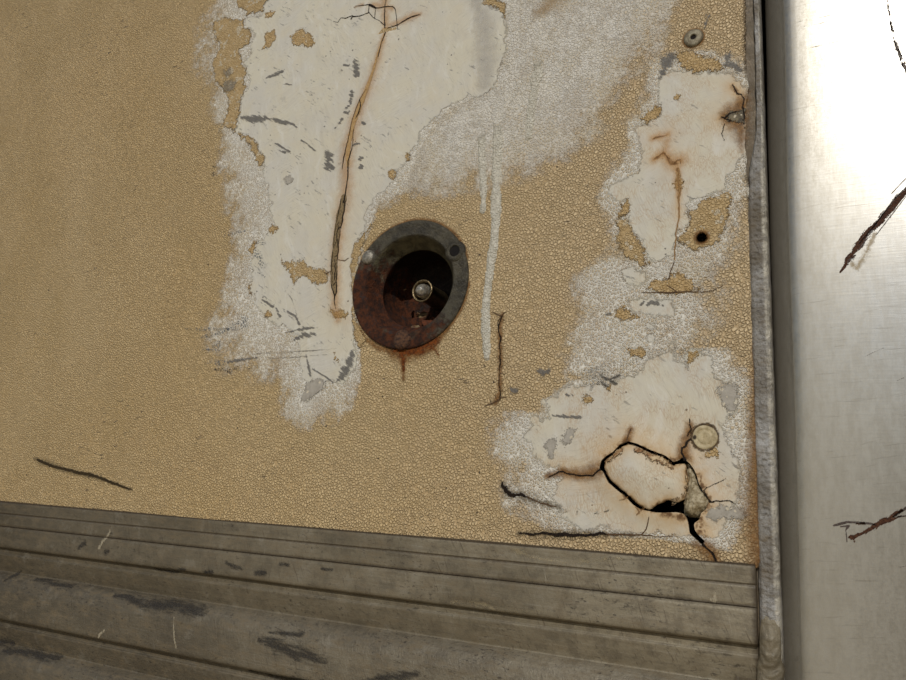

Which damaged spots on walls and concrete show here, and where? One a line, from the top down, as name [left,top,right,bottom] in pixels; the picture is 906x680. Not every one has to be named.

crack [323,0,420,308]
crack [644,136,723,293]
peeling [194,0,753,551]
rust [360,282,470,381]
crack [484,311,505,407]
crack [624,426,633,442]
crack [678,419,693,461]
crack [501,482,558,508]
crack [545,467,601,479]
crack [700,478,736,504]
crack [518,497,718,562]